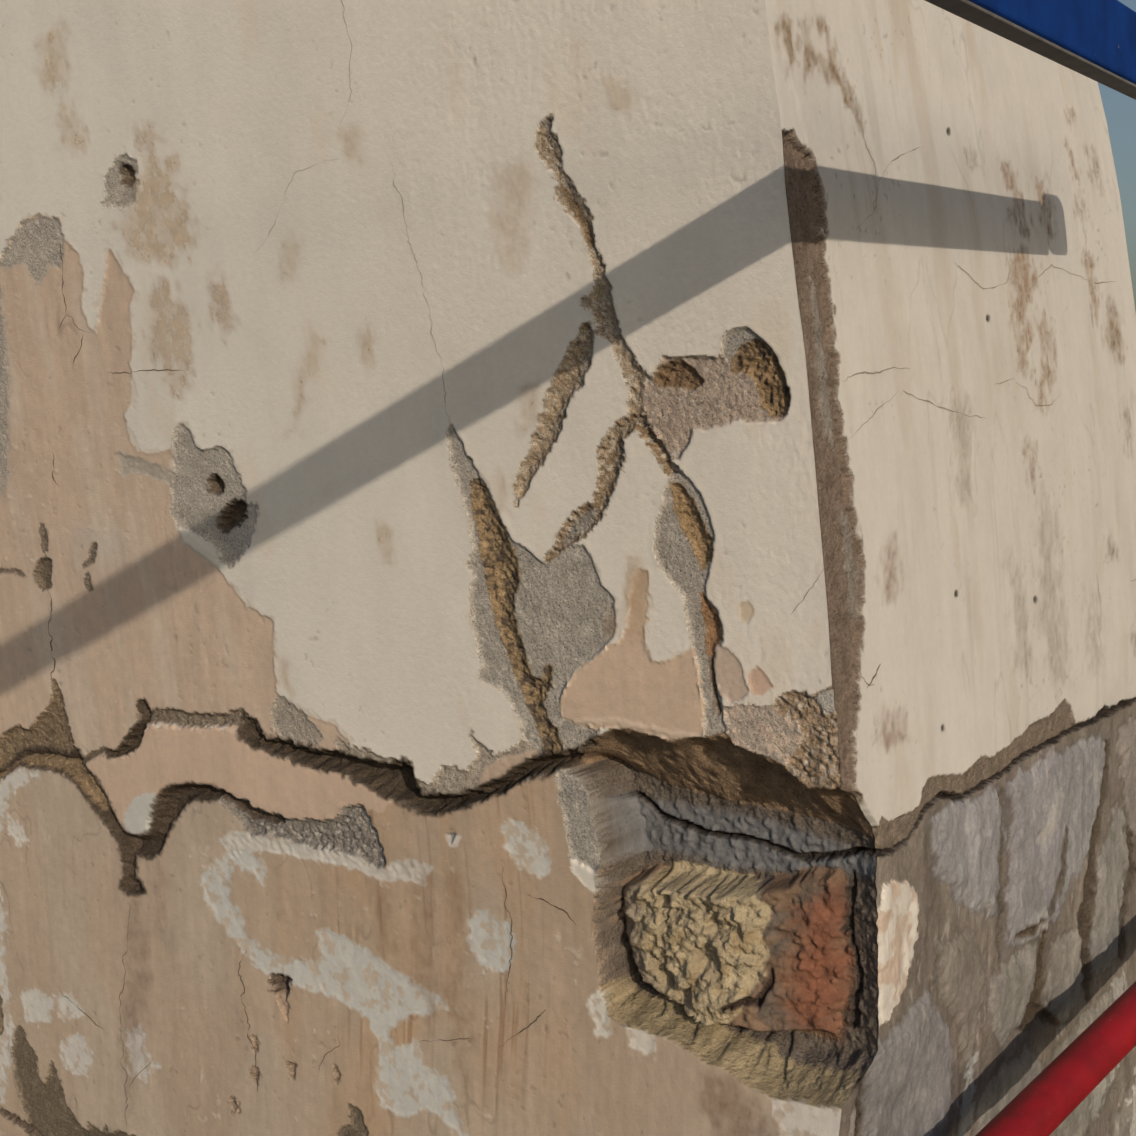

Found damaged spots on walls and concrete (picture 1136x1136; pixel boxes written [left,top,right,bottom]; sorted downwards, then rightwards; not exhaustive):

spalling [100,153,140,209]
crack [832,367,983,451]
crack [995,378,1056,406]
peeling [0,211,401,840]
crack [0,112,726,1123]
spalling [554,127,1136,1136]
spalling [415,726,543,796]
spalling [0,907,136,1136]